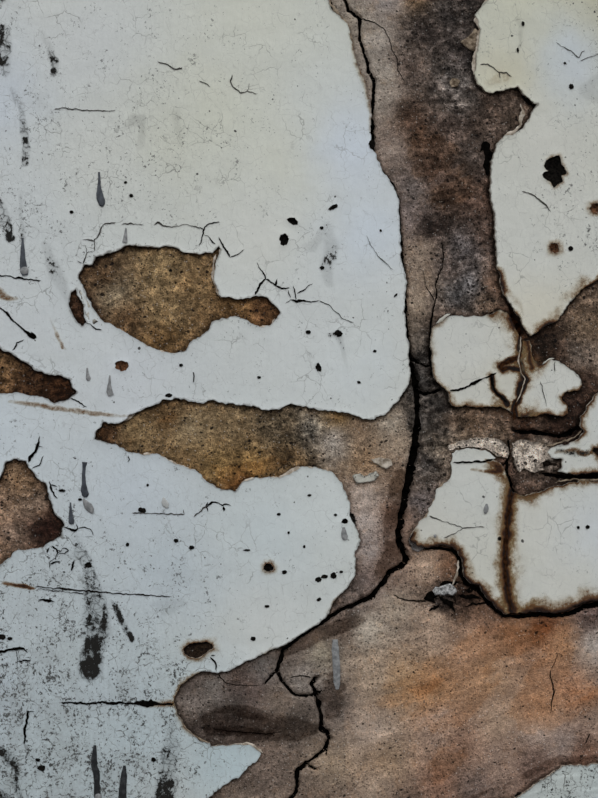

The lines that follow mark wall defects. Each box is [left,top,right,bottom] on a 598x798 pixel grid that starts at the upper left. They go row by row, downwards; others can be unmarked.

crack [331,0,404,151]
peeling [0,348,76,403]
peeling [115,361,129,371]
peeling [69,245,280,353]
peeling [329,0,598,552]
peeling [0,459,64,564]
crack [210,171,598,798]
peeling [95,377,598,798]